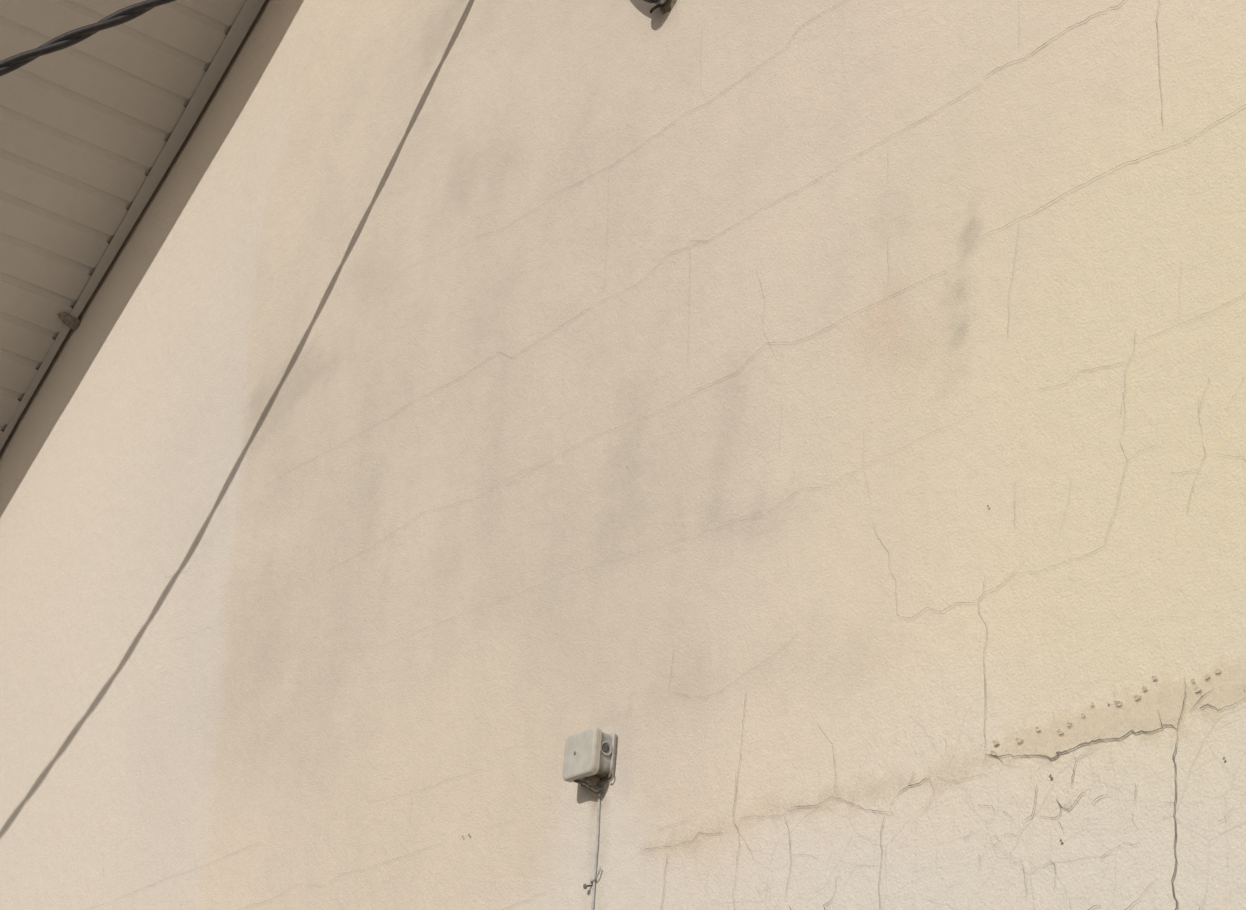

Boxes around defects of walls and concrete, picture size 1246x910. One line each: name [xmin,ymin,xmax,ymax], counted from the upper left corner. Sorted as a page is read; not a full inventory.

crack [794,775,924,889]
crack [964,598,1245,910]